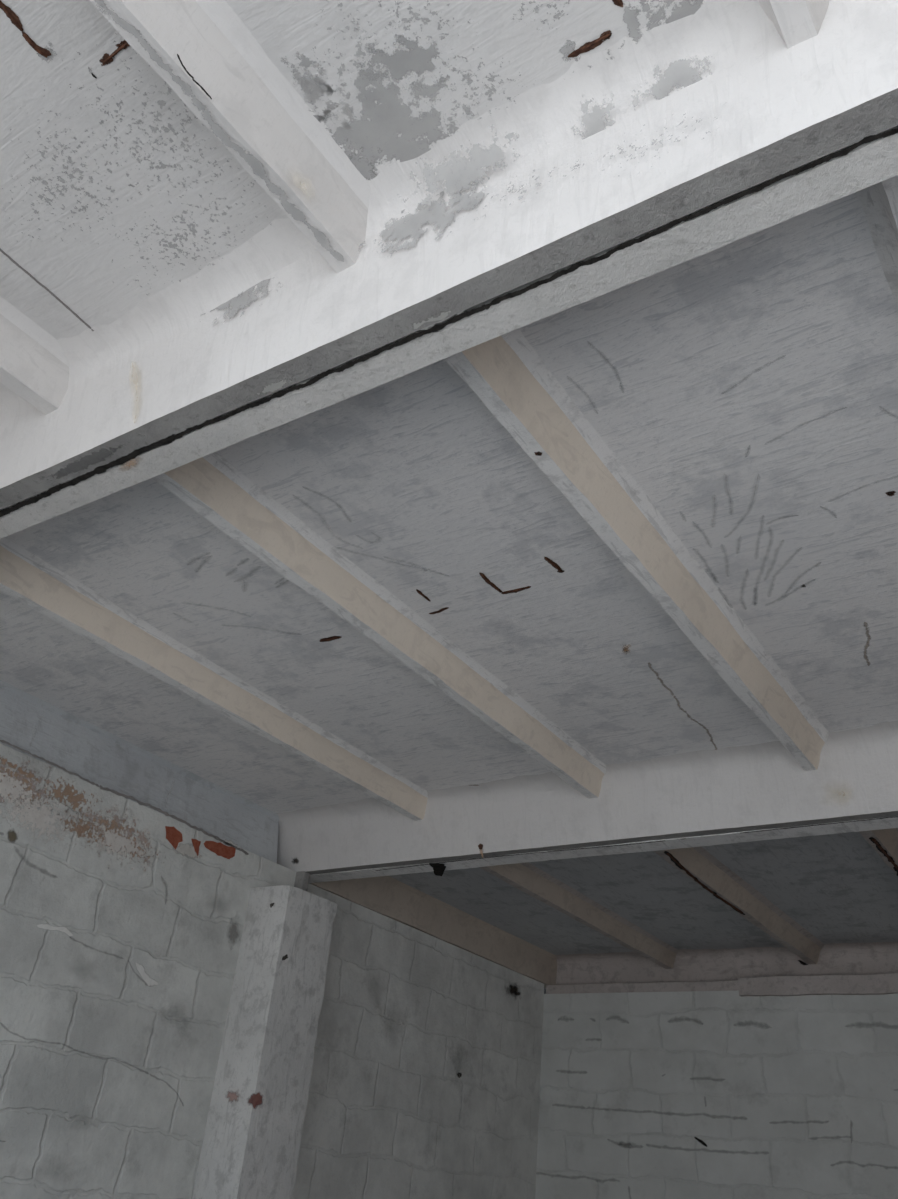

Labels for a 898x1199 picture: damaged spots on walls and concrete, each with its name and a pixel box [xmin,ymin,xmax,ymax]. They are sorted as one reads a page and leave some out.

peeling [560,0,703,68]
peeling [632,58,712,107]
peeling [282,0,584,256]
peeling [571,99,615,139]
peeling [202,279,281,323]
crack [0,128,898,517]
crack [648,663,717,750]
peeling [0,755,158,867]
flaking render [165,826,237,859]